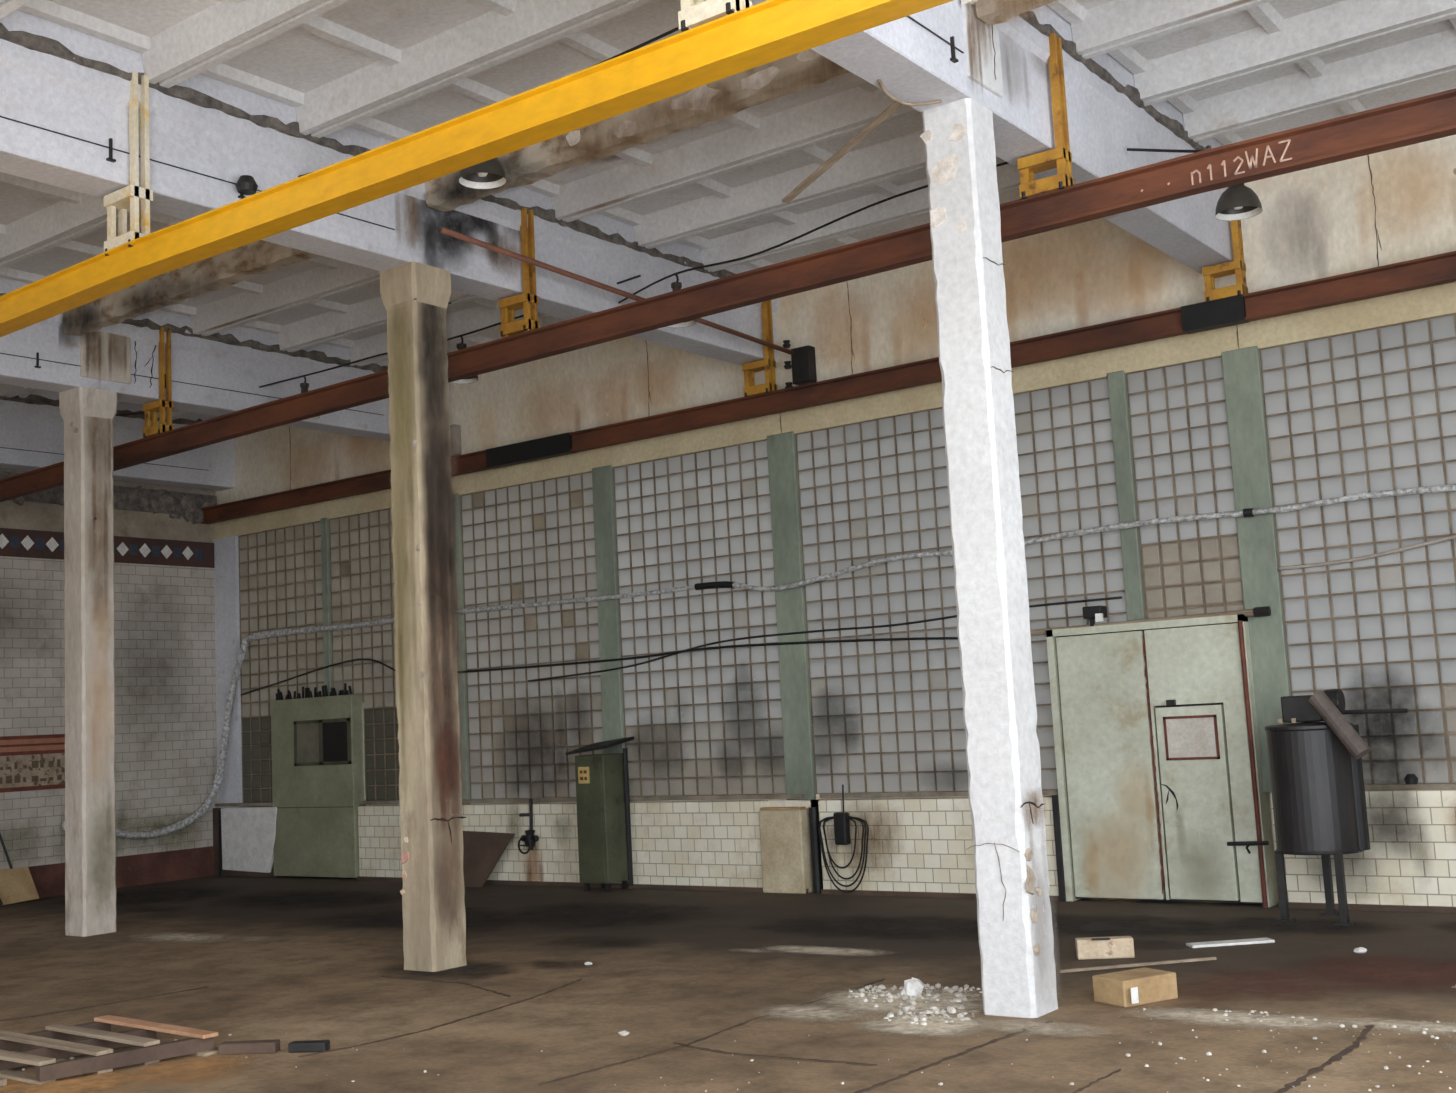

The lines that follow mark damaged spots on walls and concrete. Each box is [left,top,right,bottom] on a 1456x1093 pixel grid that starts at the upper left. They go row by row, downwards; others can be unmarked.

peeling [796,49,820,62]
peeling [741,66,781,90]
peeling [671,85,720,110]
peeling [566,130,581,146]
water stain [61,309,117,363]
spalling [10,485,64,506]
spalling [113,486,217,524]